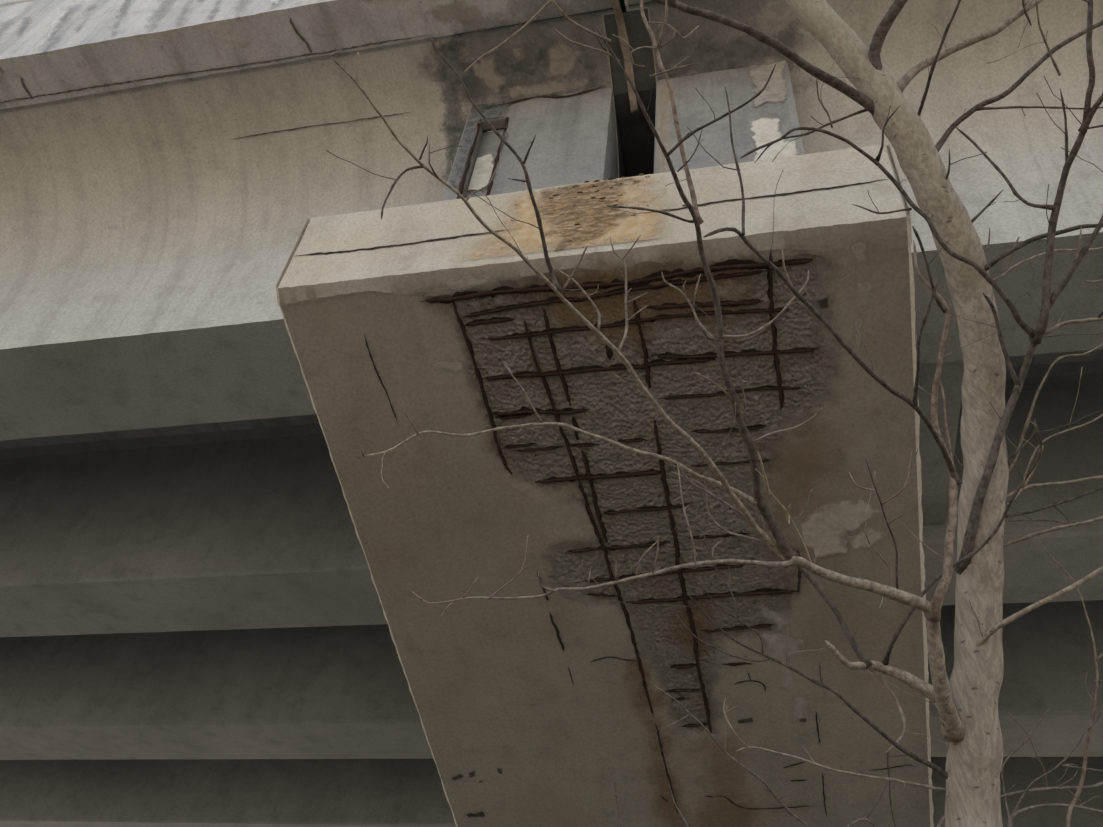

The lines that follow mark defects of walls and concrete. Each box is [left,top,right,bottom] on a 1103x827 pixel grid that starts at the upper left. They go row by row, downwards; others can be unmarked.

crack [0,18,444,103]
crack [228,112,409,140]
damp [435,40,591,186]
peeling [750,60,797,161]
crack [297,204,518,256]
rust [472,176,661,259]
crack [660,179,888,211]
crack [364,334,398,424]
spalling [420,249,836,733]